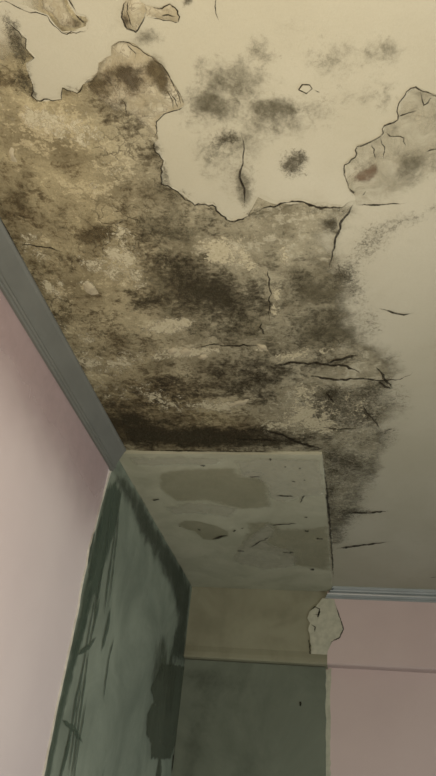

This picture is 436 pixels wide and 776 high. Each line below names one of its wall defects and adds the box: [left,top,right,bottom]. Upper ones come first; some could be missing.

leakage [6,17,28,64]
leakage [282,151,306,174]
flaking render [343,86,436,196]
leakage [78,226,112,244]
flaking render [0,0,396,543]
crack [275,355,409,402]
leakage [117,396,295,448]
leakage [302,381,386,429]
leakage [0,290,190,776]
peeling [42,461,326,776]
peeling [307,598,344,655]